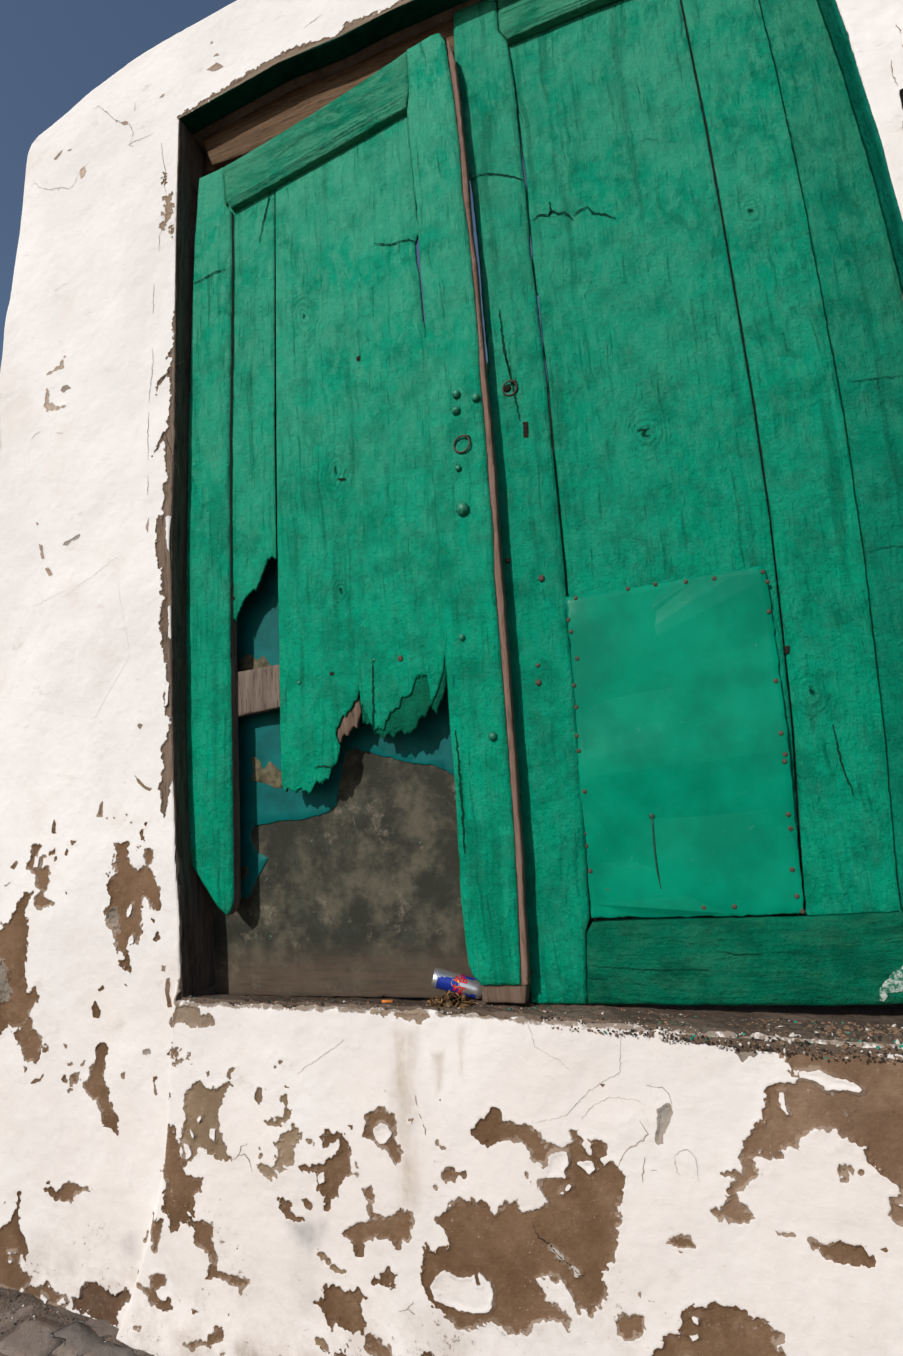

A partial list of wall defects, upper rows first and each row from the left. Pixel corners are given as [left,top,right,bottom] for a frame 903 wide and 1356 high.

peeling [177,0,412,120]
peeling [0,820,125,1136]
peeling [43,1181,90,1204]
peeling [0,1191,173,1332]
peeling [143,1067,250,1296]
peeling [182,1314,229,1356]
peeling [313,1249,398,1356]
peeling [256,1085,626,1336]
spalling [615,1292,654,1341]
peeling [652,1301,786,1356]
peeling [710,1050,903,1227]
peeling [776,1231,888,1268]